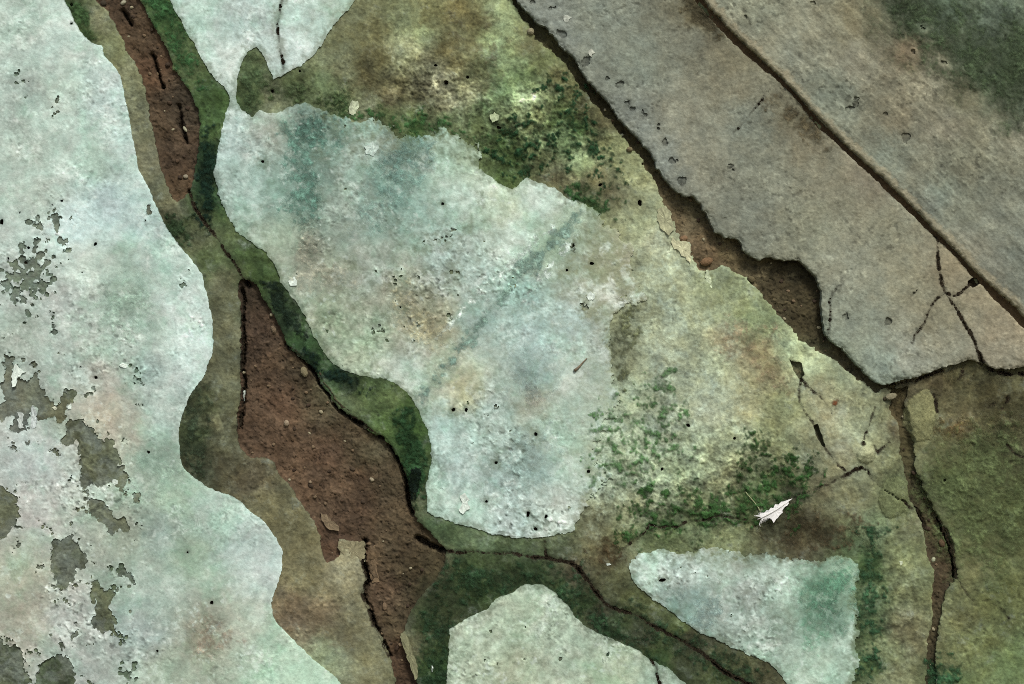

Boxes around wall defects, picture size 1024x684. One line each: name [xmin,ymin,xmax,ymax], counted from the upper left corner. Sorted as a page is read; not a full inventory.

peeling [0,208,72,335]
peeling [67,0,764,684]
crack [901,237,1024,413]
peeling [0,352,142,646]
crack [290,347,751,684]
crack [798,379,889,486]
crack [903,500,957,579]
peeling [0,622,94,684]